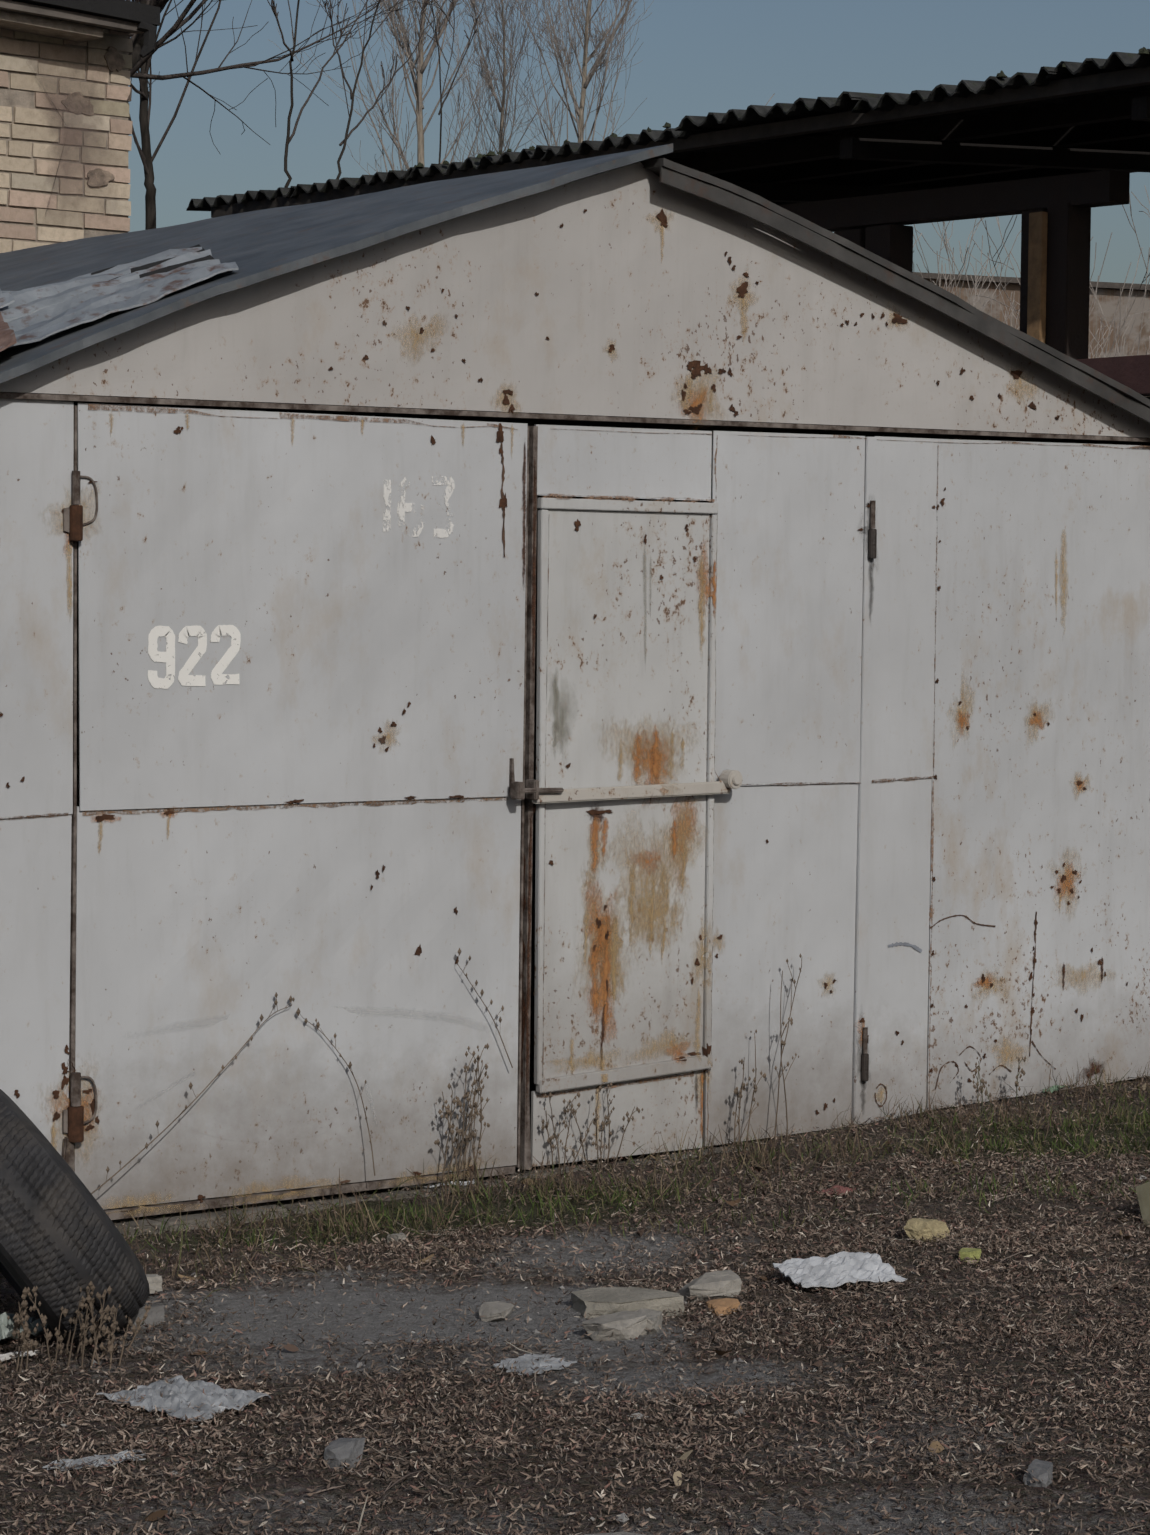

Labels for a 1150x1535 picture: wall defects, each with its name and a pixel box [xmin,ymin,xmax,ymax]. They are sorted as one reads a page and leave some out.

rust [725,252,759,339]
rust [88,360,739,672]
rust [958,694,969,730]
rust [1031,708,1050,727]
rust [619,731,684,784]
rust [1051,863,1082,905]
rust [521,775,723,1141]
rust [979,974,997,992]
rust [1062,947,1106,990]
rust [52,1045,100,1147]